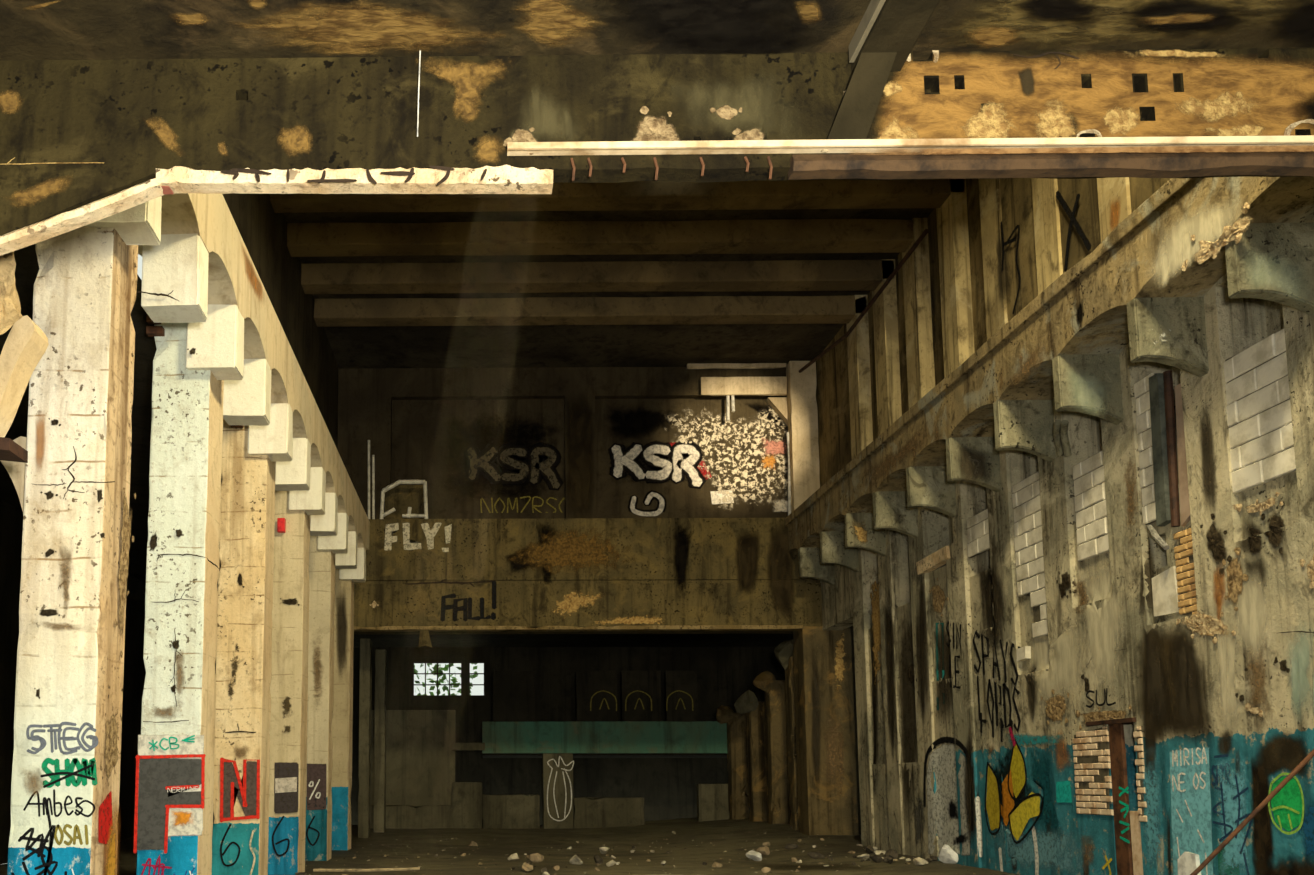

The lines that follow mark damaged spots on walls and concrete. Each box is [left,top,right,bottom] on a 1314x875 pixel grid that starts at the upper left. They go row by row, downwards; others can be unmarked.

peeling [245,0,469,54]
peeling [431,61,504,120]
peeling [878,0,1314,139]
spalling [0,127,553,256]
crack [34,446,115,499]
leakage [675,529,690,585]
leakage [1140,541,1155,610]
flaking render [1173,514,1249,644]
leakage [1218,560,1270,712]
flaking render [1041,689,1147,822]
leakage [1140,628,1207,784]
leakage [1219,732,1314,875]